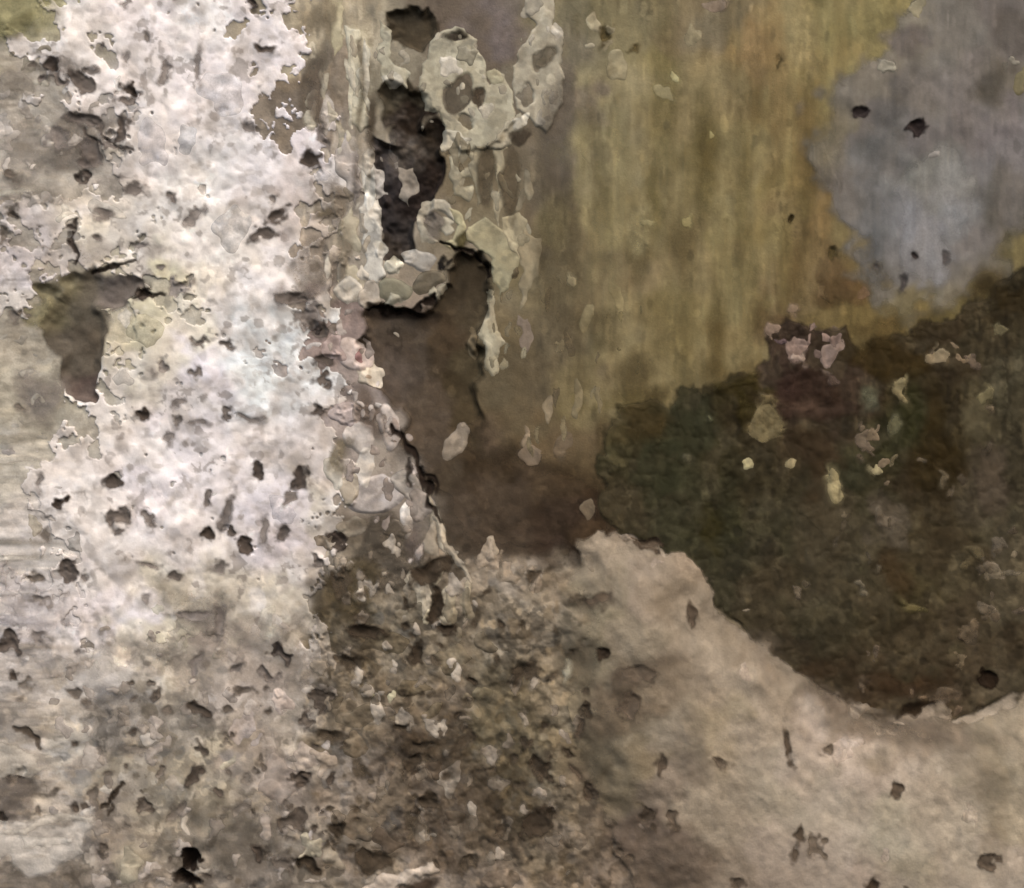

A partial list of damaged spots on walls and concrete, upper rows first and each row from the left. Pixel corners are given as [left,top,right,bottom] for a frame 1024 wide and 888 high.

damp [599,27,613,51]
damp [653,71,680,101]
peeling [764,323,845,387]
peeling [925,342,982,371]
peeling [0,0,624,888]
peeling [742,458,754,470]
peeling [746,393,784,443]
damp [595,267,1024,722]
peeling [827,467,849,550]
peeling [855,376,908,486]
peeling [953,526,1024,670]
peeling [910,687,963,717]